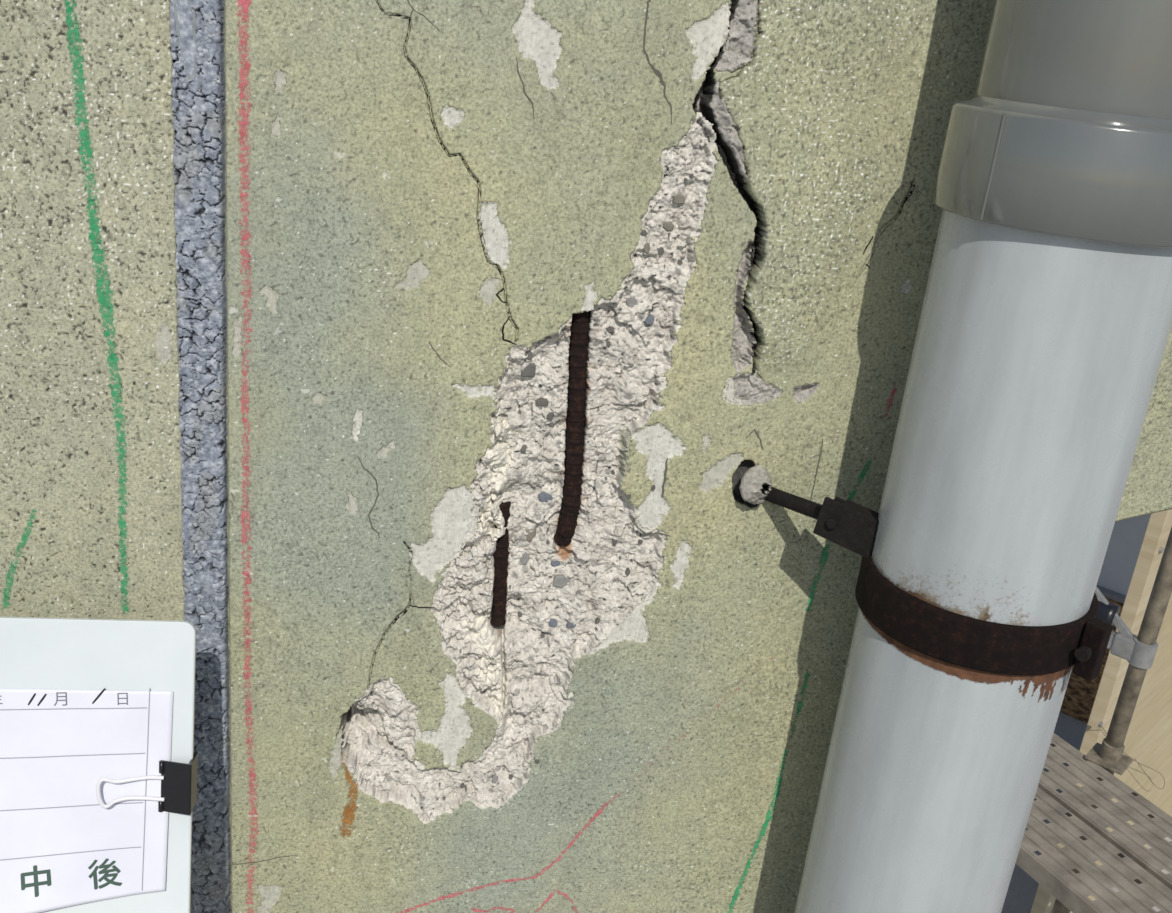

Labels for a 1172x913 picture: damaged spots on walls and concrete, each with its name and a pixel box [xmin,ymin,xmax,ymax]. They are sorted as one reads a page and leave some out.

crack [376,0,519,345]
crack [643,0,763,375]
crack [357,456,435,688]
spalling [327,0,759,824]
rust [339,756,358,836]